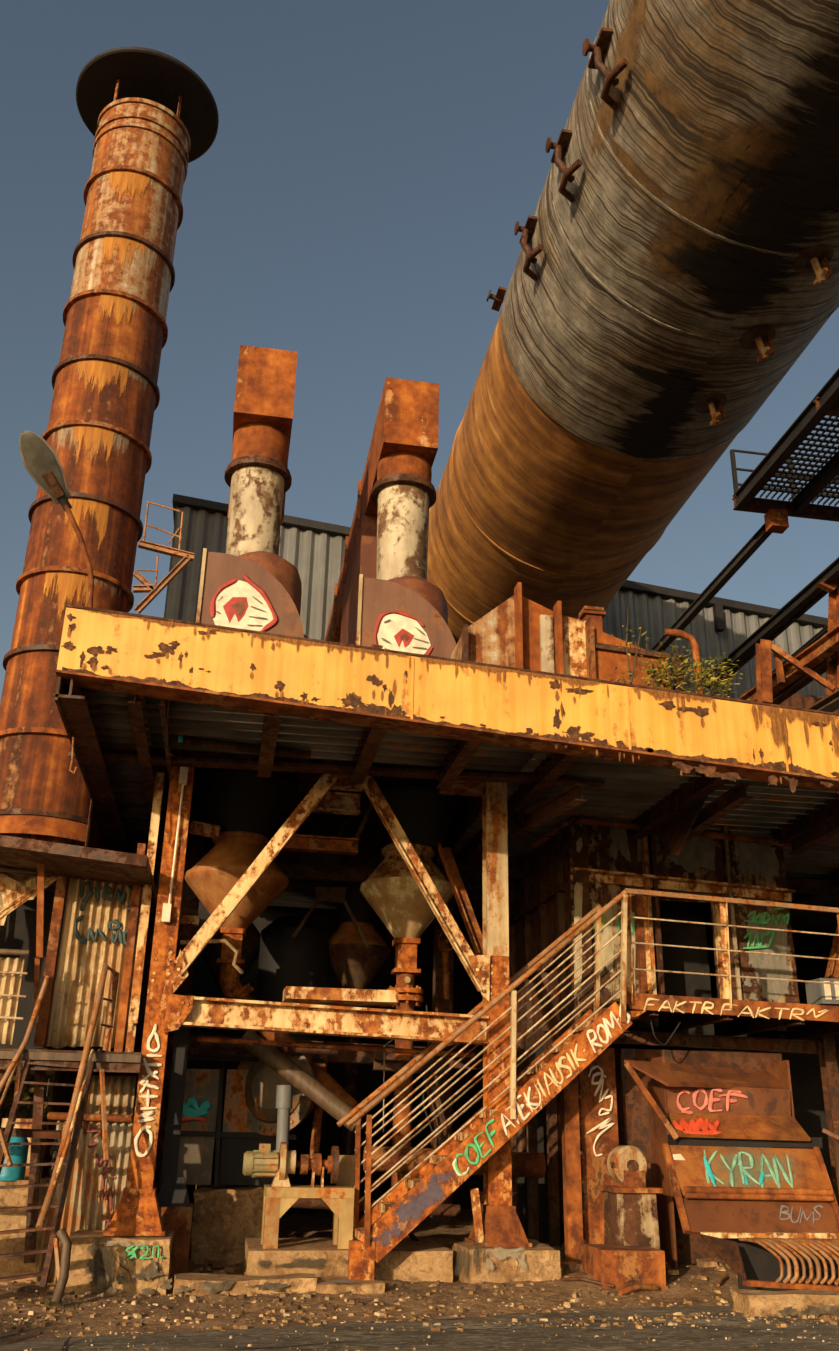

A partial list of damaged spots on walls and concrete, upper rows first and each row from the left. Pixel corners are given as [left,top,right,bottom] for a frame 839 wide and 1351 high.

rust [427,310,738,639]